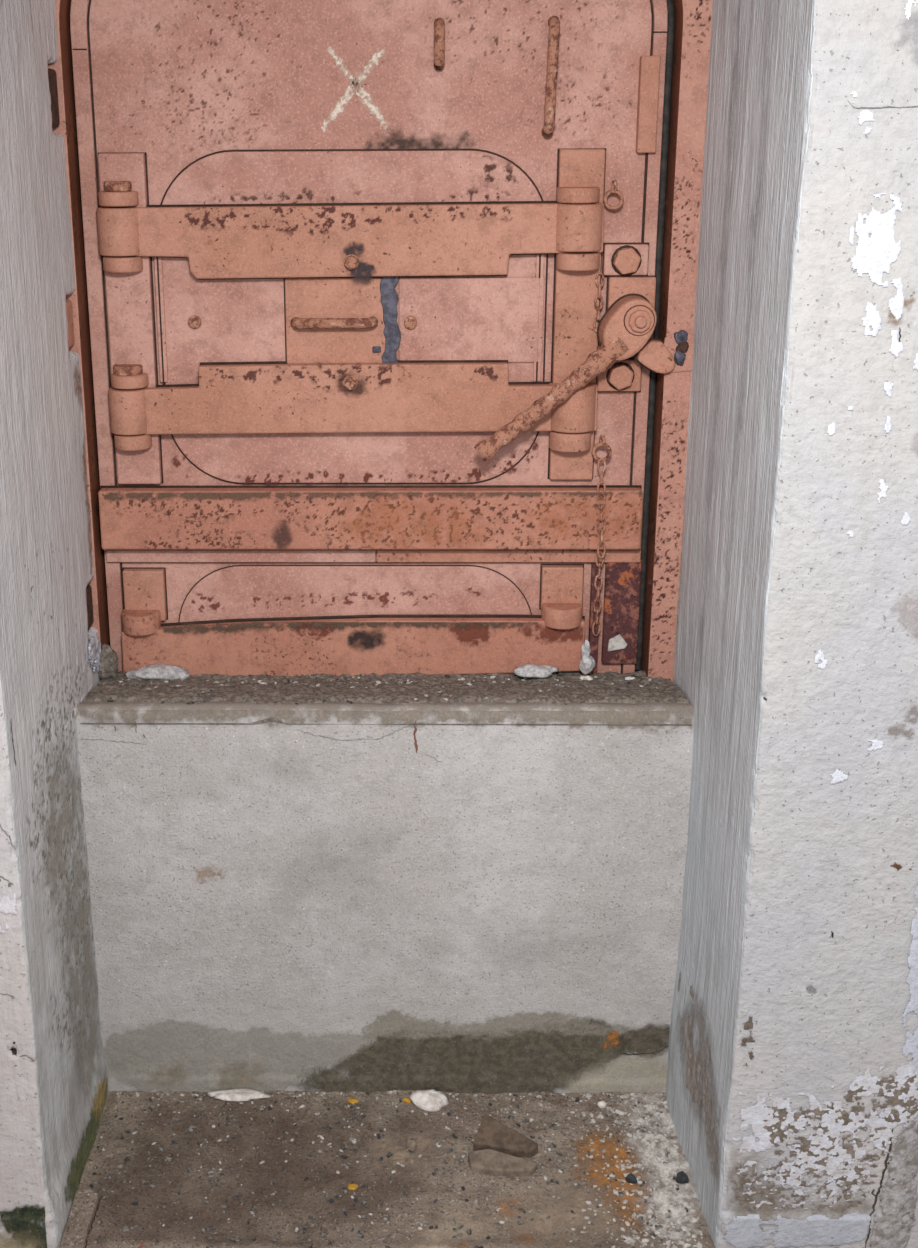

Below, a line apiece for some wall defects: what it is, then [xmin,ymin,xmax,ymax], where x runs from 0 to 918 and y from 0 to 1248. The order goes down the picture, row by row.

peeling [849,193,918,370]
corrosion [253,591,431,608]
corrosion [135,442,639,549]
corrosion [451,623,489,645]
corrosion [519,625,583,642]
corrosion [648,422,684,670]
damp [31,671,628,1092]
peeling [678,973,715,1169]
peeling [722,880,918,1248]